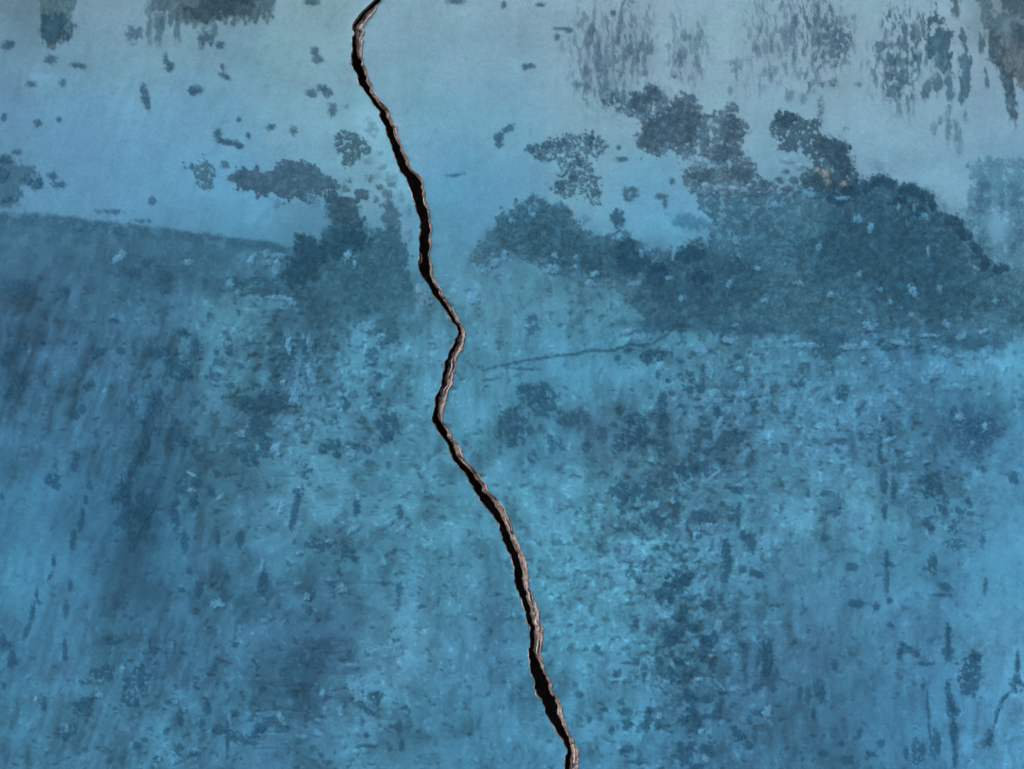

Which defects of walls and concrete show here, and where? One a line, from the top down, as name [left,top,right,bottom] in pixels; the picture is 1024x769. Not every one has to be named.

mould [307,84,335,114]
mould [816,17,850,68]
water stain [47,129,412,314]
water stain [470,42,1024,358]
crack [350,0,579,769]
crack [505,341,655,366]